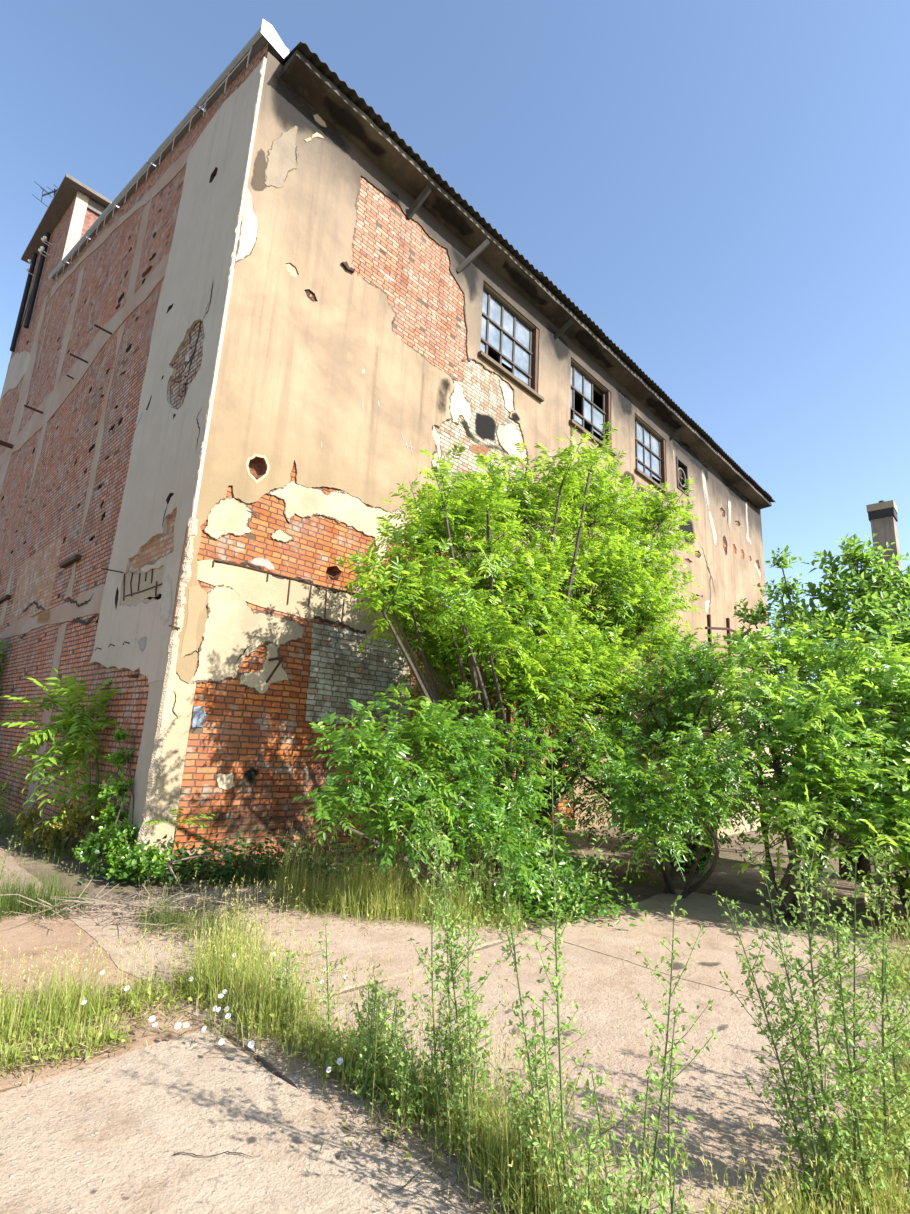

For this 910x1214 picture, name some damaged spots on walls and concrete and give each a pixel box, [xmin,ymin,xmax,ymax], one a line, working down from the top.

flaking render [235,114,327,264]
flaking render [161,319,205,419]
flaking render [340,175,529,502]
spalling [248,457,266,480]
spalling [58,594,99,626]
flaking render [115,480,442,851]